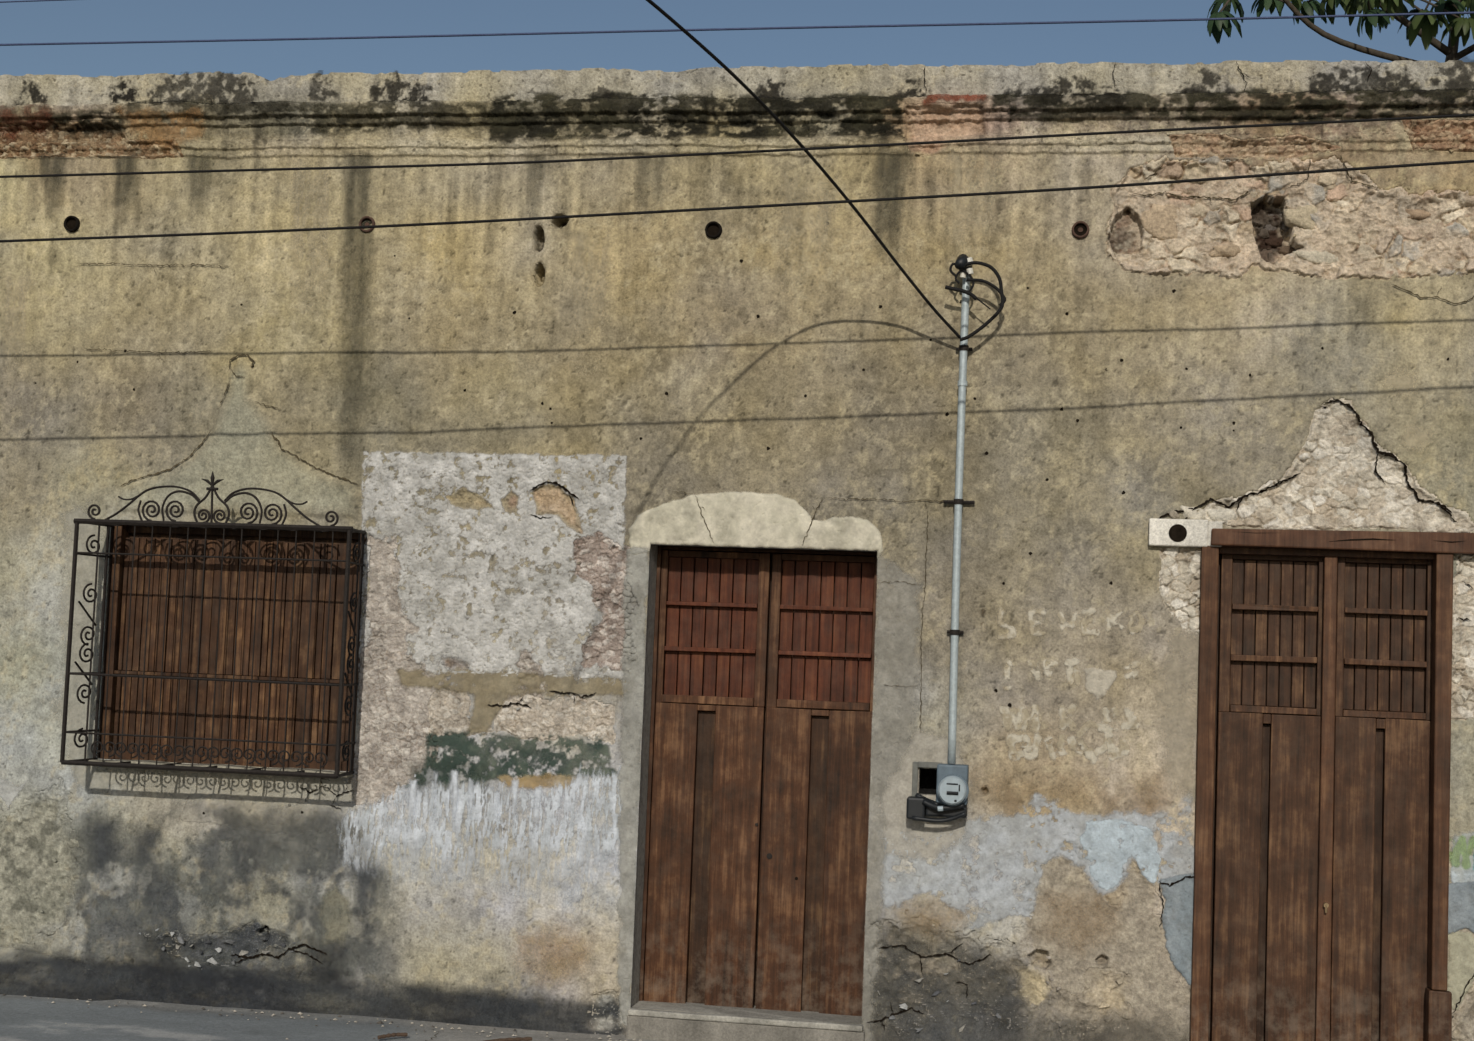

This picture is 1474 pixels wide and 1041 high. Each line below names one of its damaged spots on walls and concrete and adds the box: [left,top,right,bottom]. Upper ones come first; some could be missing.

spalling [1105,155,1474,280]
spalling [1196,398,1474,533]
flaking render [346,534,616,807]
flaking render [445,483,631,671]
spalling [1159,546,1201,634]
spalling [1451,554,1474,720]
spalling [139,921,295,970]
damp [0,825,631,1035]
peeling [870,841,1190,1041]
spalling [1452,984,1474,1041]